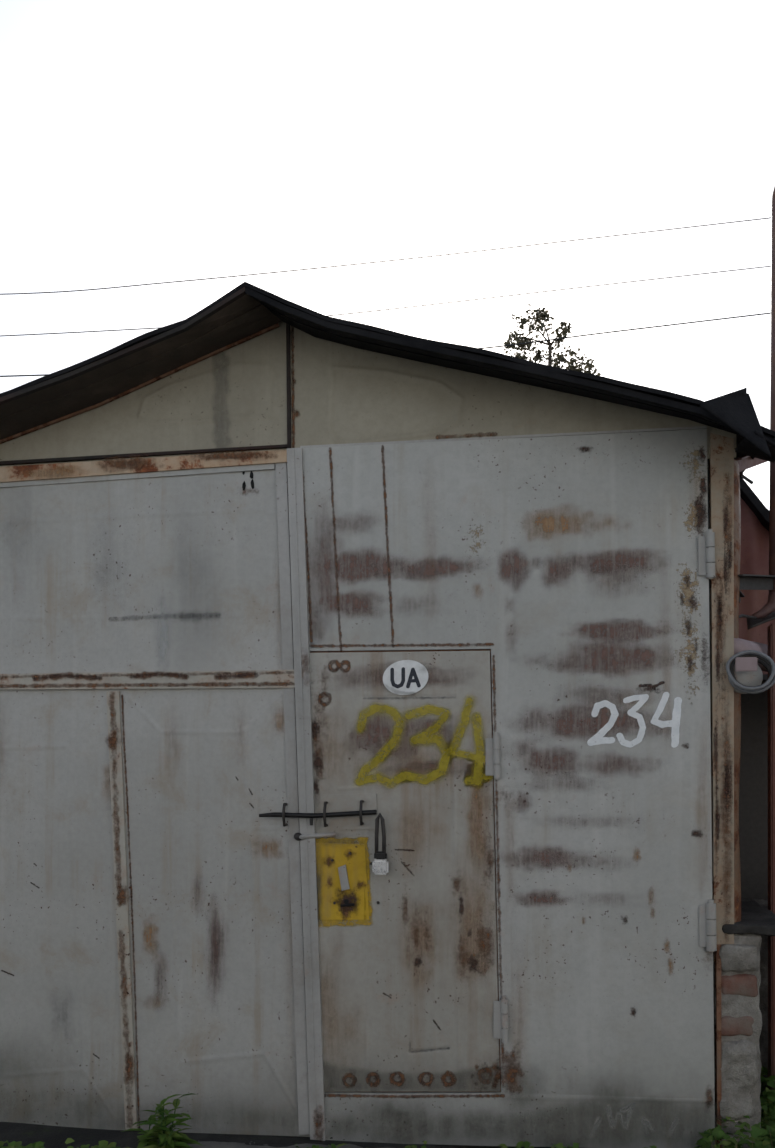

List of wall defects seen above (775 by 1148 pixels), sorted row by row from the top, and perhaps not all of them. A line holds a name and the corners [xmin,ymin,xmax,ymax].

corrosion [199,451,269,460]
corrosion [293,445,496,729]
corrosion [501,553,527,582]
corrosion [548,551,648,583]
corrosion [702,490,732,677]
corrosion [563,622,660,673]
corrosion [639,681,665,691]
corrosion [714,721,732,907]
corrosion [0,671,294,1129]
corrosion [454,780,502,994]
corrosion [524,893,560,904]
corrosion [324,1039,523,1098]